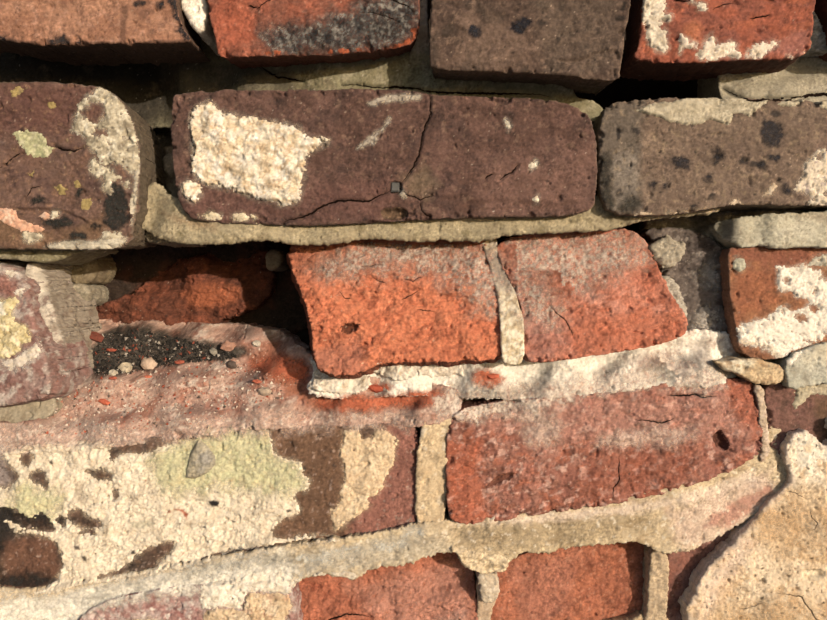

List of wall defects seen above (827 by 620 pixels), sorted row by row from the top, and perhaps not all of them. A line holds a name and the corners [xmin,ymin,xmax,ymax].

crack [259,65,301,81]
crack [285,84,549,222]
peeling [792,383,827,409]
spalling [713,430,730,452]
flaking render [0,424,399,595]
crack [735,593,818,620]